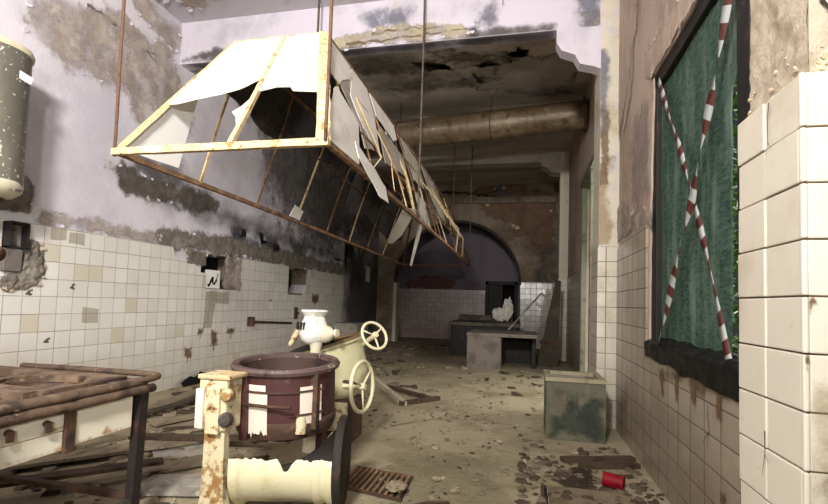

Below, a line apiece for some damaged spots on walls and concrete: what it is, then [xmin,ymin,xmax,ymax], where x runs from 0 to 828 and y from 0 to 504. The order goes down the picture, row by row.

flaking render [23,0,205,124]
flaking render [334,23,475,51]
peeling [477,54,578,98]
water stain [600,49,610,185]
flaking render [0,177,34,214]
flaking render [115,155,220,213]
flaking render [0,240,47,296]
peeling [39,210,345,291]